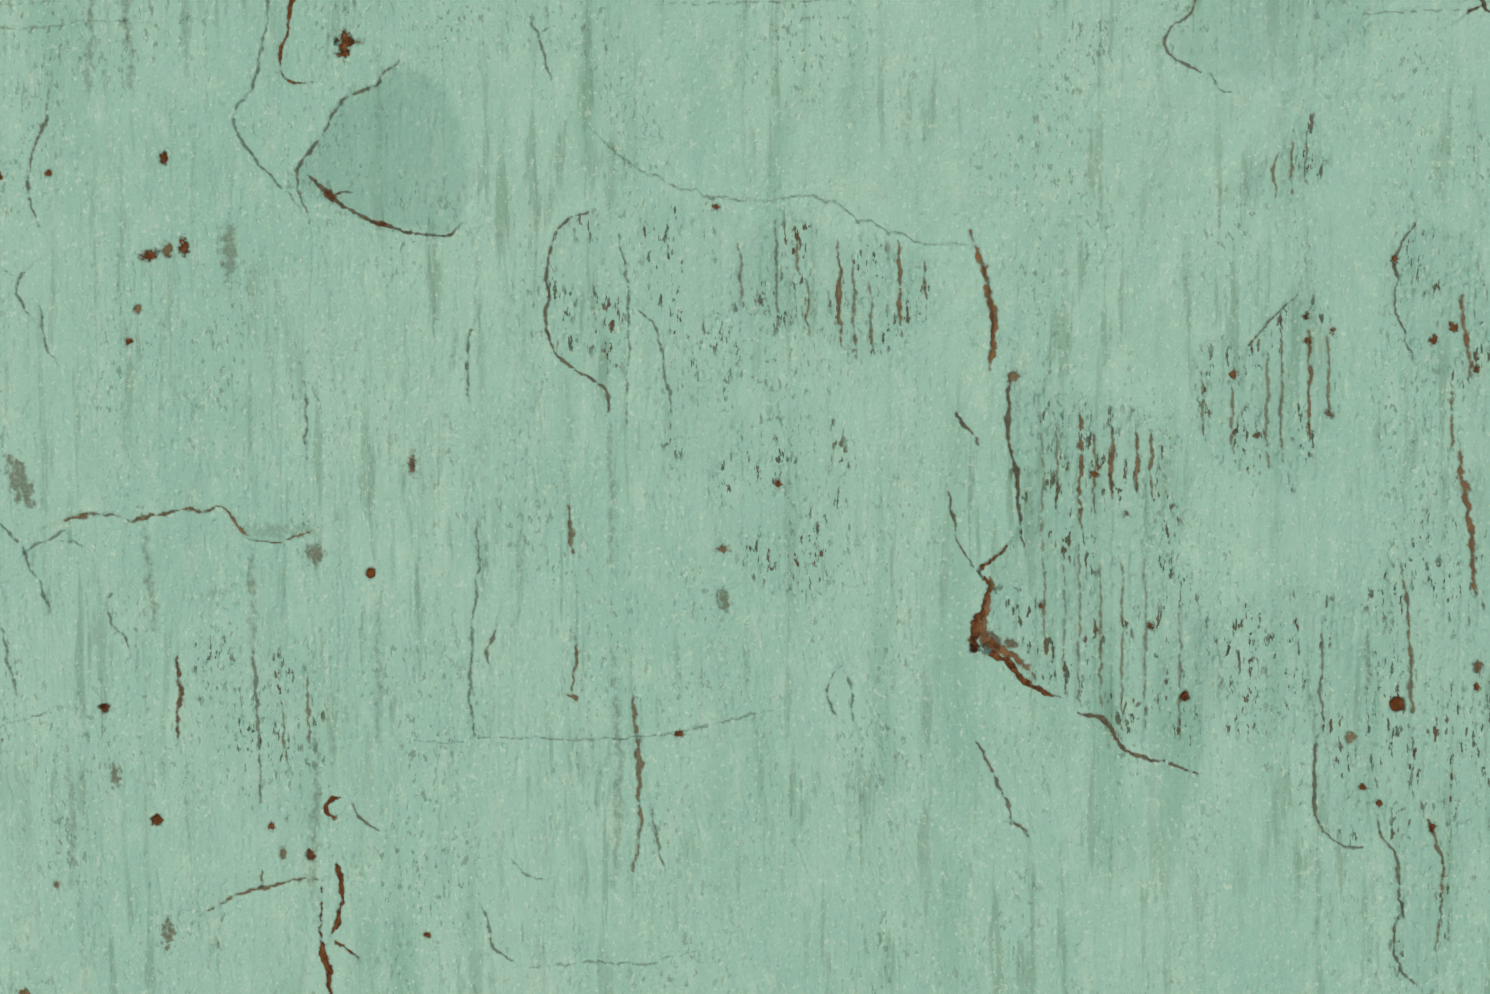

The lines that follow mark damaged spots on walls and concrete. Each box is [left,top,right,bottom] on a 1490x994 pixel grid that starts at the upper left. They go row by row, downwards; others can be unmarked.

crack [1467,0,1490,14]
crack [233,0,300,187]
crack [969,230,998,370]
crack [643,314,671,428]
crack [2,506,310,607]
crack [948,492,980,574]
crack [1078,712,1197,774]
crack [207,864,359,994]